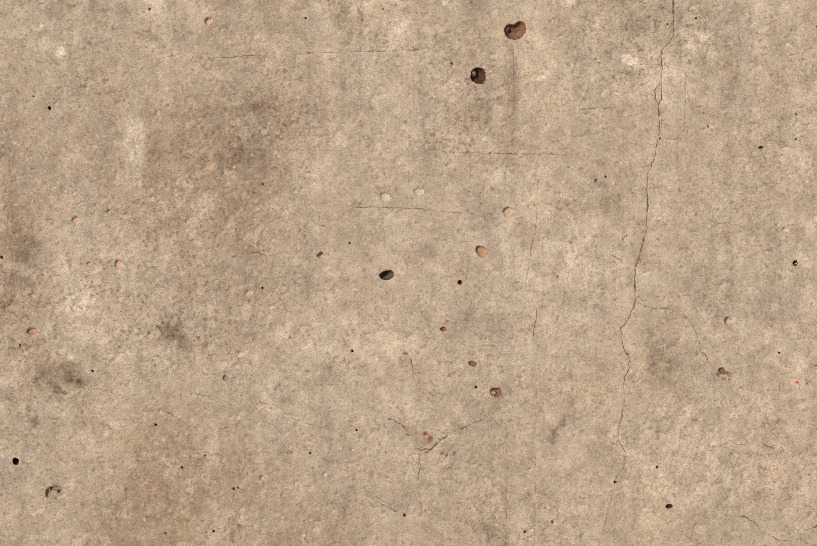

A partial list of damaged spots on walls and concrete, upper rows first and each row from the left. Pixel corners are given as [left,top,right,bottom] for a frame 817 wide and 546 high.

crack [621,0,674,417]